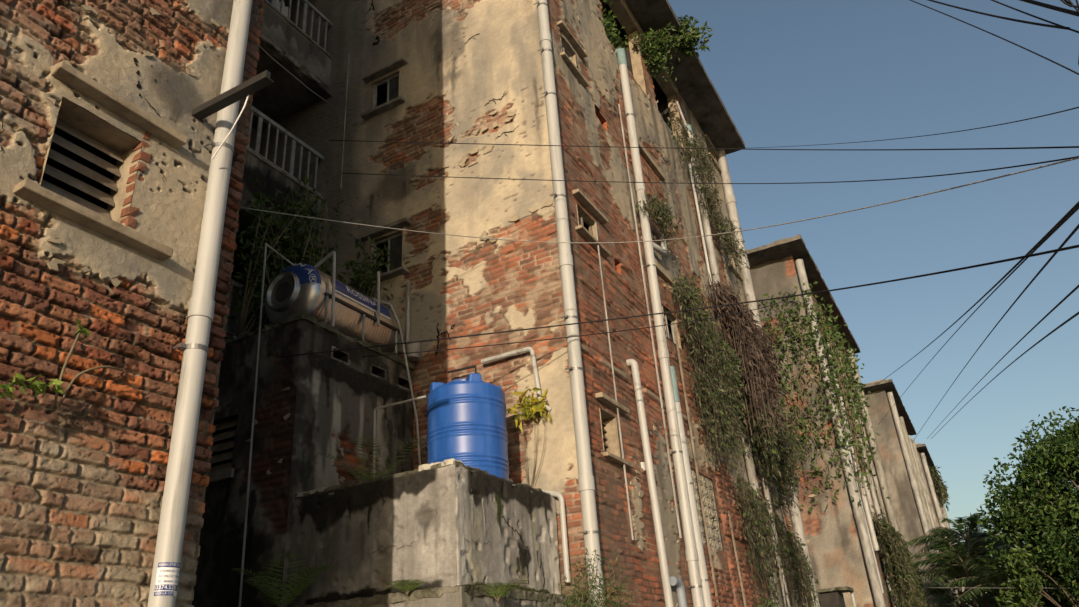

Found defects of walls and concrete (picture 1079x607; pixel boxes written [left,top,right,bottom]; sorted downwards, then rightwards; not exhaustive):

peeling [0,0,229,181]
peeling [242,0,321,83]
peeling [366,0,480,40]
peeling [368,90,516,190]
peeling [0,195,189,495]
peeling [189,93,254,506]
peeling [397,200,569,484]
water stain [215,478,272,607]
water stain [299,468,436,534]
crack [465,516,545,589]
water stain [459,467,552,577]
peeling [556,464,590,607]